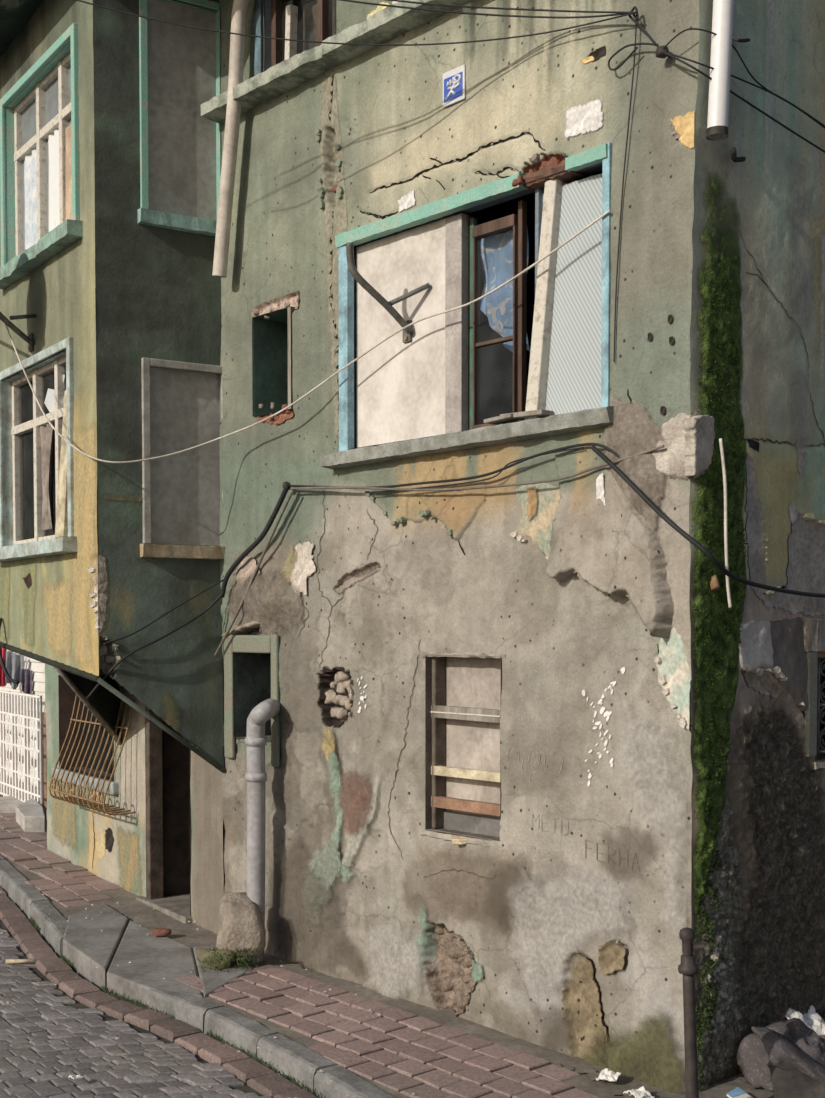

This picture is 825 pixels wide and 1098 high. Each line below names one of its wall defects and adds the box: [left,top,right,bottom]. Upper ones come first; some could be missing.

crack [315,76,545,447]
crack [740,231,825,478]
flaking render [88,554,121,677]
peeling [282,541,316,596]
flaking render [327,456,486,555]
flaking render [510,440,695,734]
peeling [739,453,825,729]
flaking render [417,905,483,1017]
flaking render [560,939,627,1058]
leakage [581,1015,684,1095]
leakage [621,720,682,929]
leakage [695,704,825,1088]